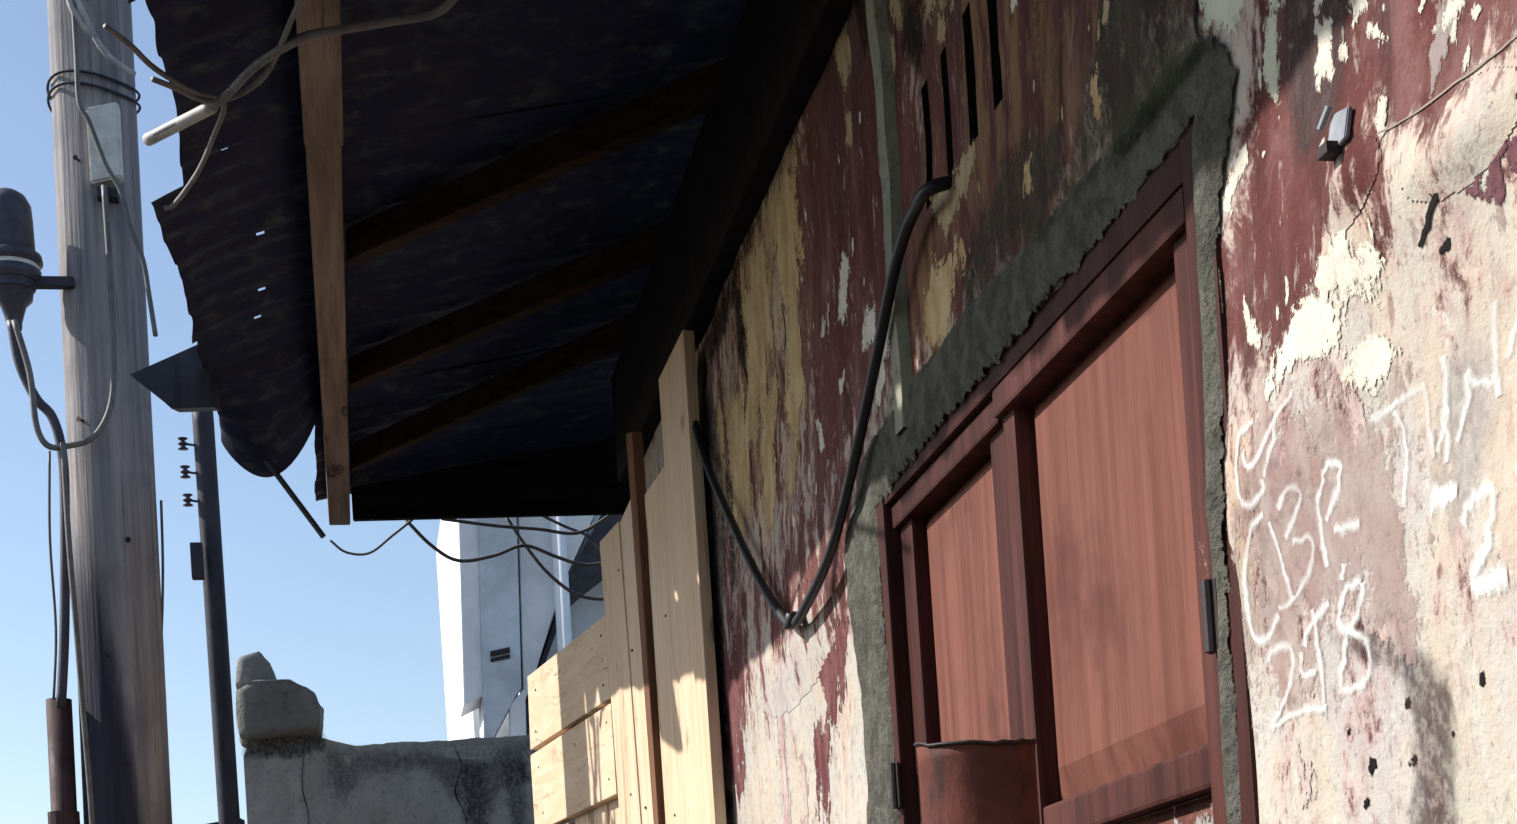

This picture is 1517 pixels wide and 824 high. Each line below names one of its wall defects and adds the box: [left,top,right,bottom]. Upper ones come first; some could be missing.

damp [901,0,925,70]
peeling [1256,0,1286,119]
peeling [1312,0,1389,93]
peeling [1431,0,1482,76]
damp [963,0,1193,307]
peeling [1219,140,1265,218]
peeling [1480,136,1517,206]
peeling [921,139,980,348]
peeling [716,136,890,585]
peeling [1243,218,1403,452]
crack [301,758,309,824]
peeling [799,717,833,824]